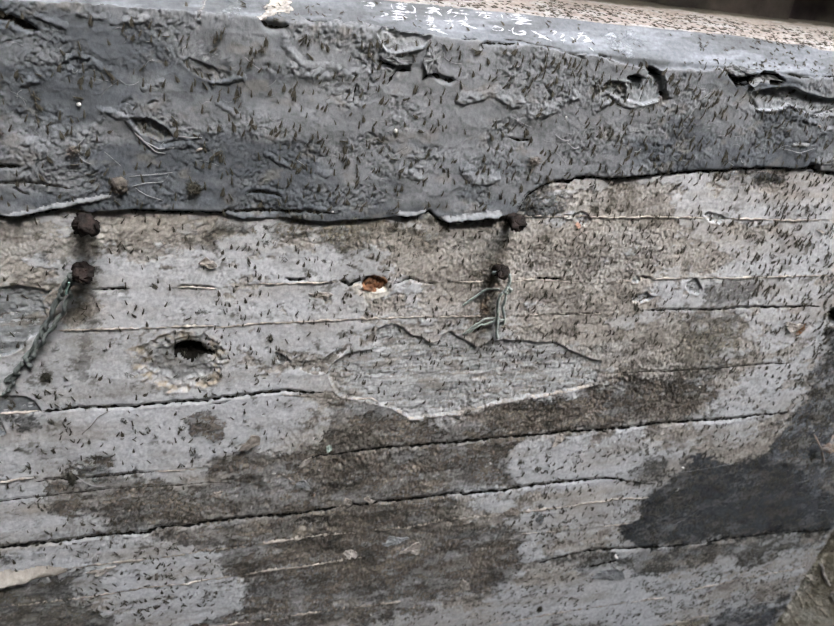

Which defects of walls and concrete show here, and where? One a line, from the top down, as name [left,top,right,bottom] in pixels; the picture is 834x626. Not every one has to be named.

spalling [0,14,37,30]
peeling [377,27,444,75]
spalling [183,57,232,81]
peeling [603,68,666,105]
peeling [725,64,834,116]
spalling [134,117,171,141]
spalling [504,212,528,232]
spalling [704,212,725,225]
leakage [43,278,834,626]